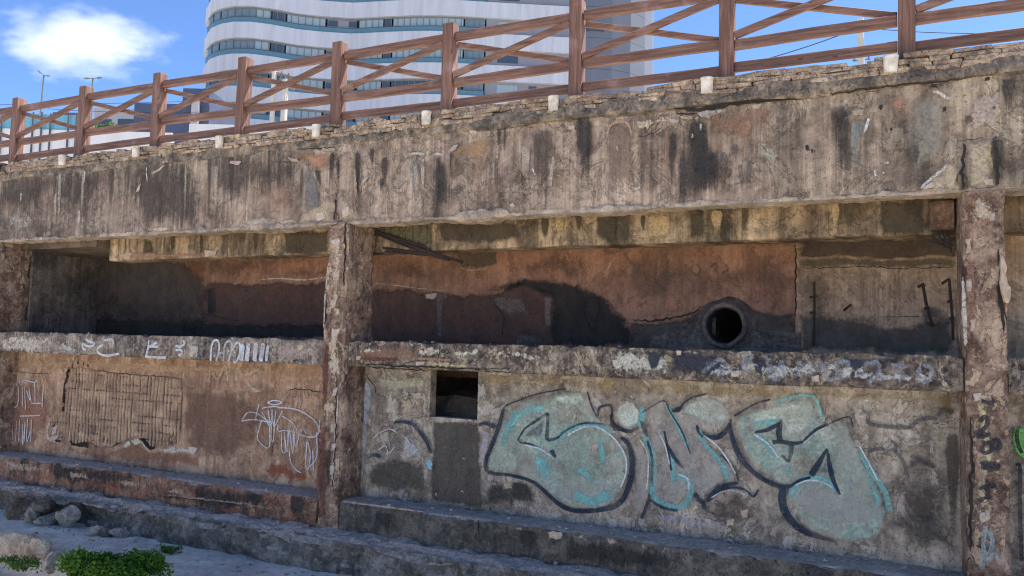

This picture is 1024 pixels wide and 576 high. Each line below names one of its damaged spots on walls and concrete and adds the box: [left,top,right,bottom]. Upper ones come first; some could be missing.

water stain [410,152,453,203]
water stain [532,130,551,182]
water stain [576,117,592,173]
water stain [665,120,752,199]
water stain [831,107,870,171]
crack [956,143,966,189]
spalling [2,336,197,455]
peeling [612,350,699,373]
peeling [709,361,941,382]
peeling [973,393,994,523]